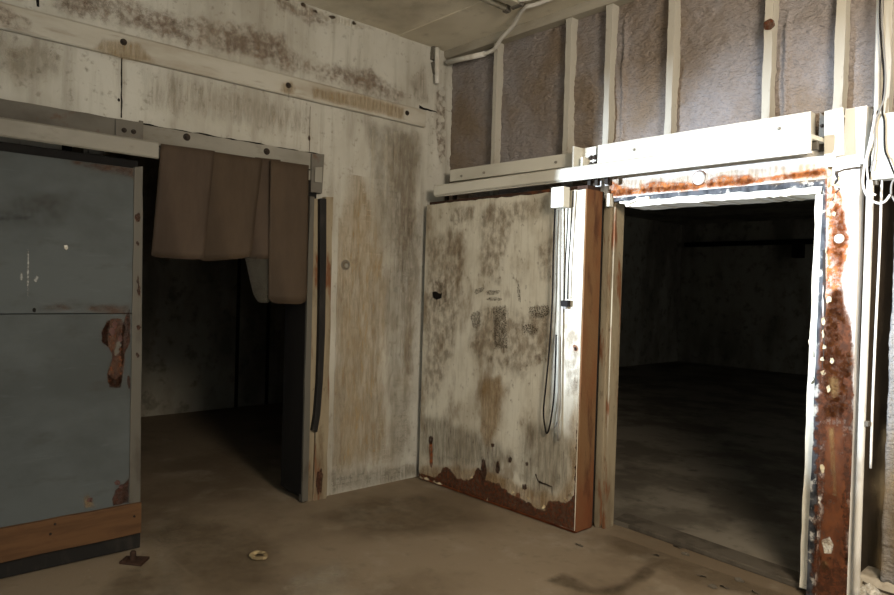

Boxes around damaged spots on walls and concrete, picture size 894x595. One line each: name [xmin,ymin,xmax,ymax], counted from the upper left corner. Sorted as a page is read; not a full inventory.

crack [117,58,125,118]
rust [102,318,130,388]
leakage [336,186,384,462]
rust [609,164,855,595]
rust [419,423,578,530]